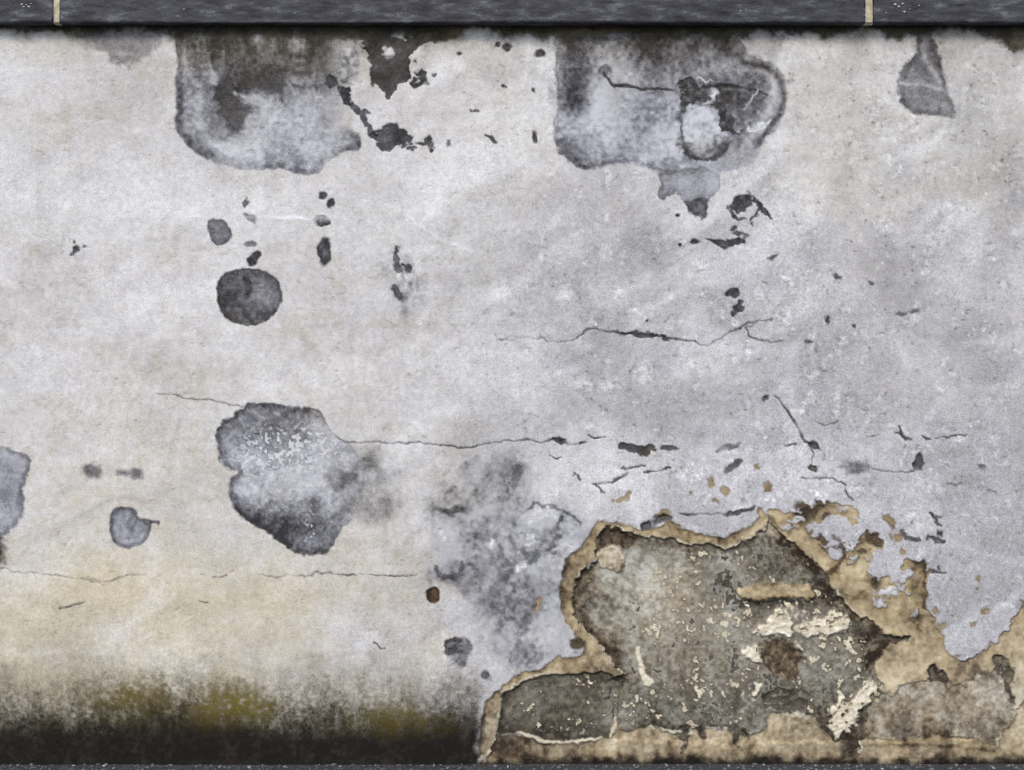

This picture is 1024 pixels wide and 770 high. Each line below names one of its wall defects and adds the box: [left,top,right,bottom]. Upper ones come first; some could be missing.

flaking render [478,500,1024,764]